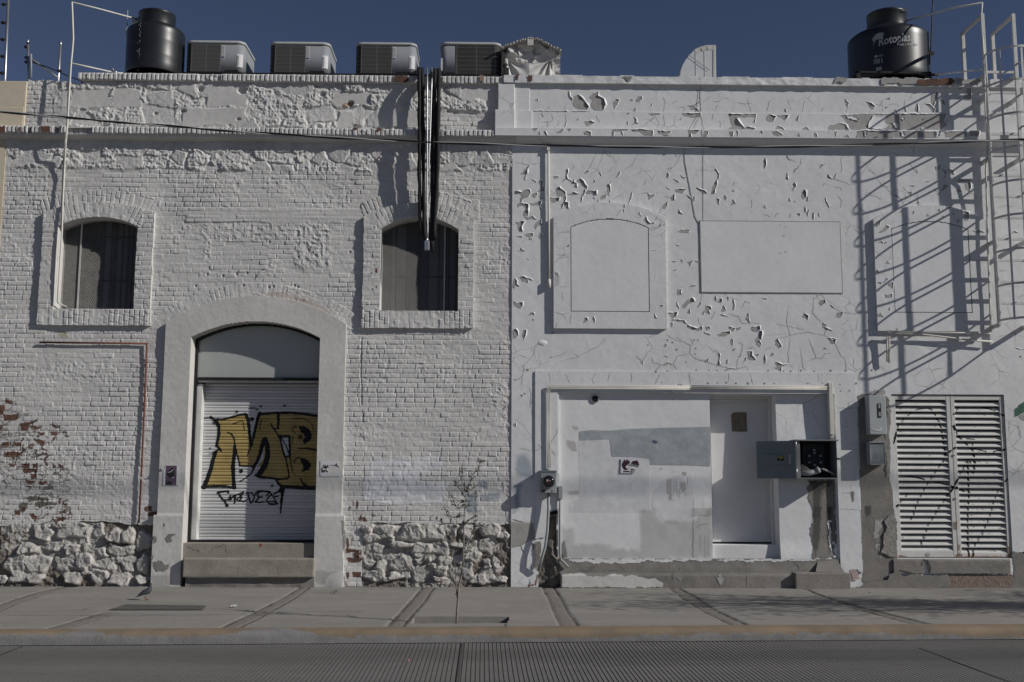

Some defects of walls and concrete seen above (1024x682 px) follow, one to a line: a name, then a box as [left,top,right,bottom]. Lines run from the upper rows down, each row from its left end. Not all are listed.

peeling [533,91,671,136]
peeling [680,107,709,137]
peeling [516,165,621,259]
peeling [648,169,736,214]
peeling [787,155,830,219]
crack [787,156,937,205]
peeling [513,301,535,339]
crack [515,286,874,407]
peeling [655,285,789,371]
peeling [0,398,84,523]
peeling [806,480,838,559]
peeling [342,520,362,586]